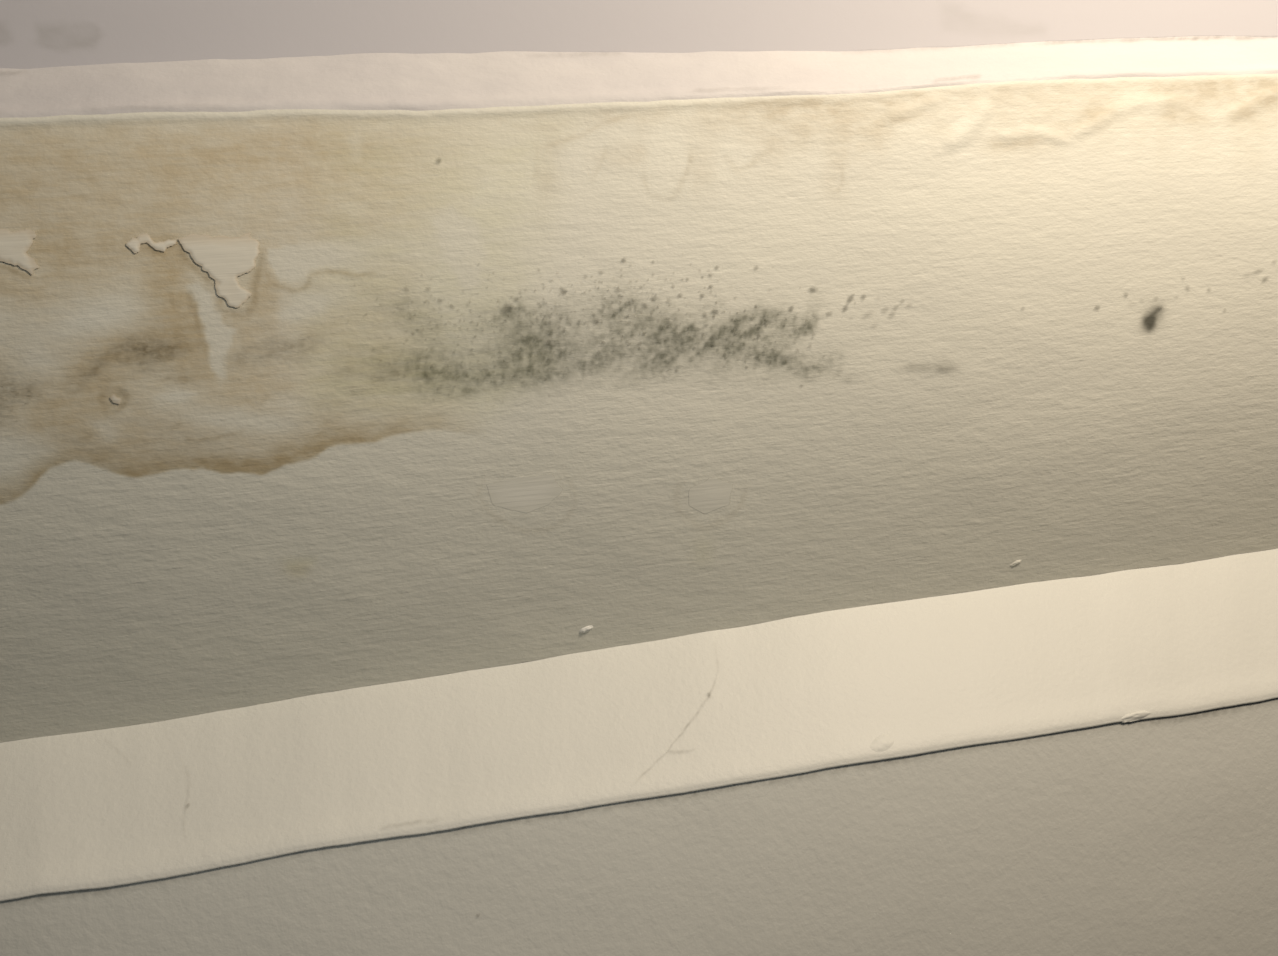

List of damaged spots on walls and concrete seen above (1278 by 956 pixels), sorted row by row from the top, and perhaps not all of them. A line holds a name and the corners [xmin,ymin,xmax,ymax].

peeling [0,228,39,275]
peeling [126,233,260,308]
leakage [1145,313,1156,328]